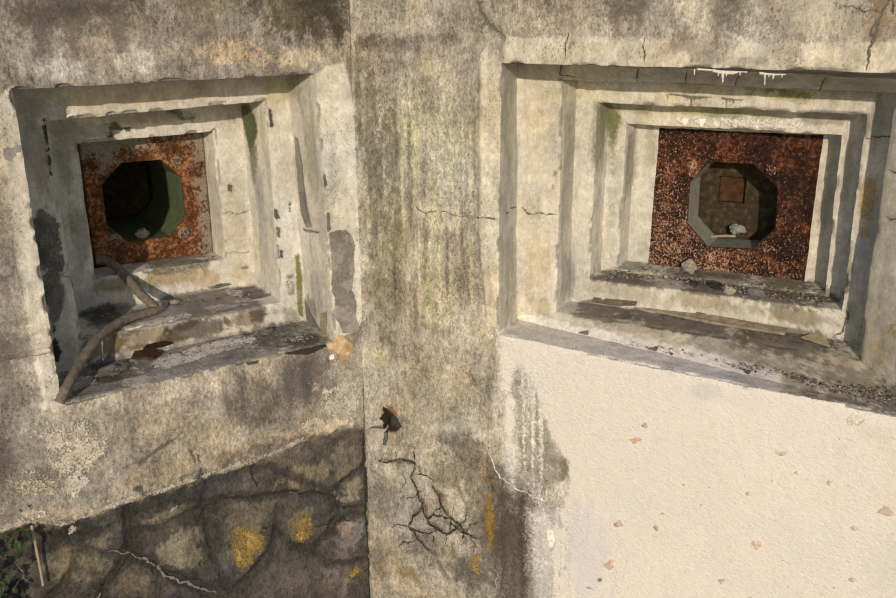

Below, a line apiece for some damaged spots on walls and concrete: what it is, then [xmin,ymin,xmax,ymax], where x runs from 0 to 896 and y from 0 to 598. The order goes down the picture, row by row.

crack [346,0,354,70]
crack [841,0,895,70]
crack [415,206,558,220]
crack [139,434,201,465]
crack [222,385,477,597]
crack [97,505,217,598]